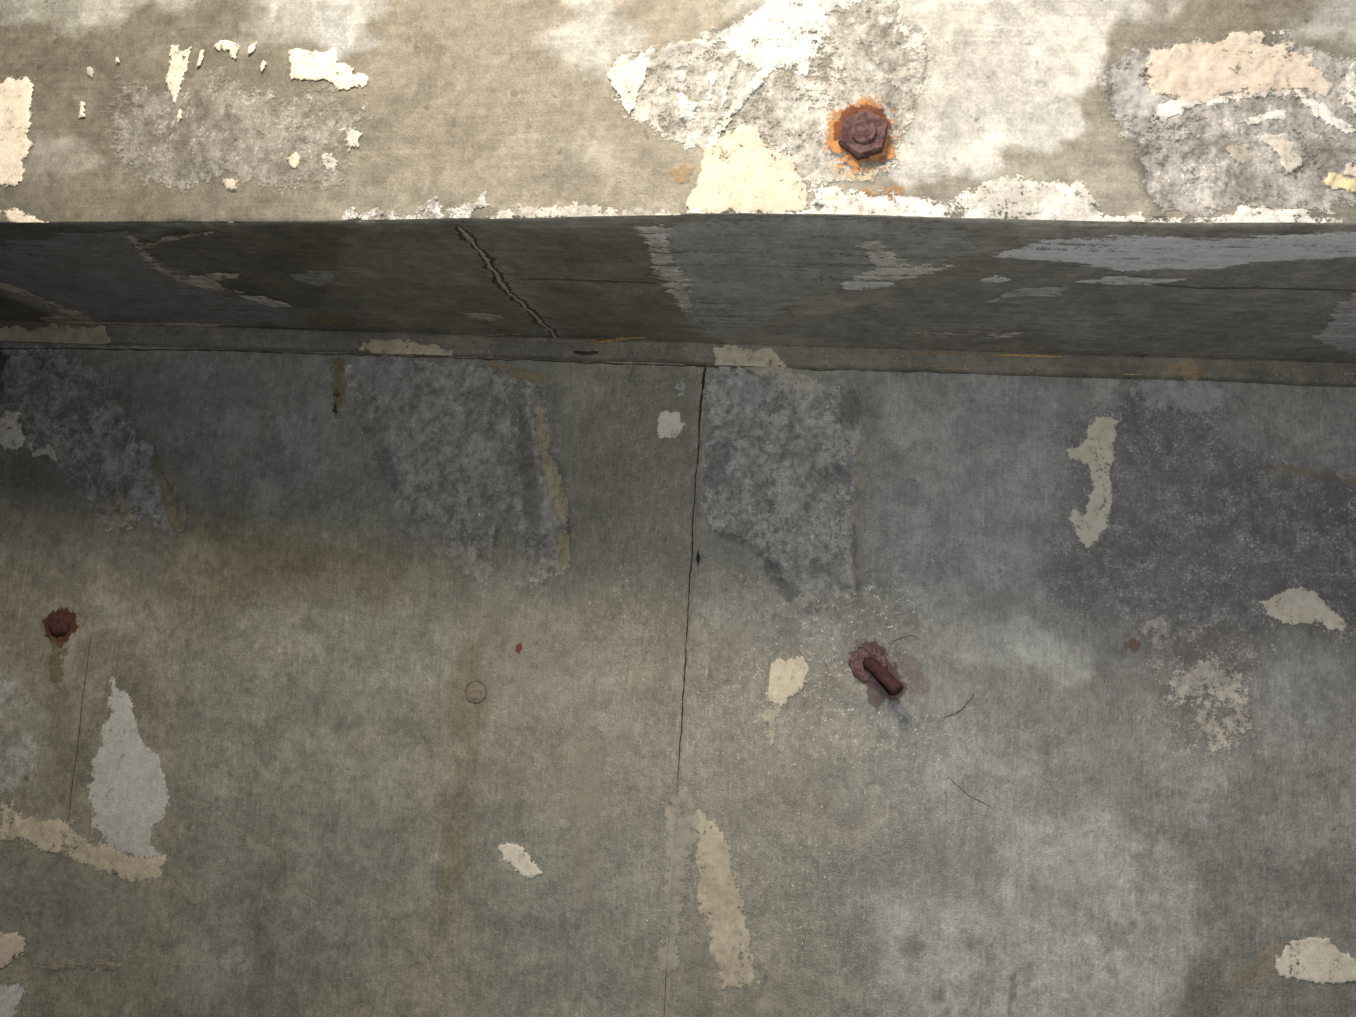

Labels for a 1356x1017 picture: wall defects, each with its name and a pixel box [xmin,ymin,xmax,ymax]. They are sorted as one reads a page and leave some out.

spalling [607,0,936,186]
corrosion [821,93,901,176]
spalling [1095,29,1356,220]
peeling [0,208,49,223]
crack [454,225,656,337]
spalling [333,354,572,588]
peeling [656,410,686,440]
spalling [698,366,866,626]
corrosion [42,607,78,648]
corrosion [848,639,907,709]